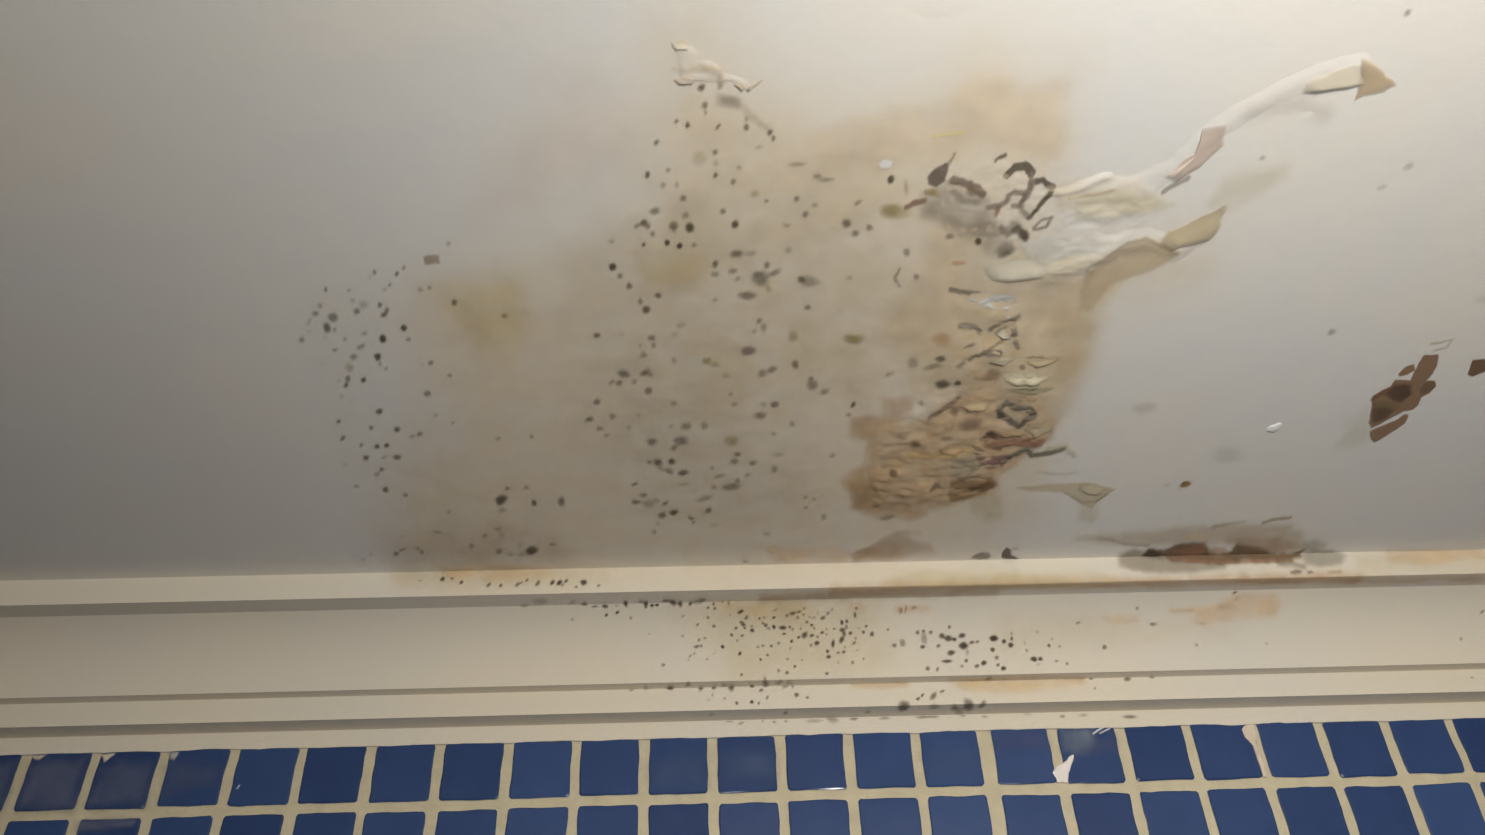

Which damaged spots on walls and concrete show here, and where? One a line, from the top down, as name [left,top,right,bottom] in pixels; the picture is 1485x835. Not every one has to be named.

leakage [905,153,1068,249]
peeling [848,52,1395,516]
leakage [905,270,1079,409]
peeling [1369,354,1439,442]
peeling [1468,359,1485,376]
leakage [583,599,716,626]
leakage [721,607,873,674]
leakage [921,630,1013,670]